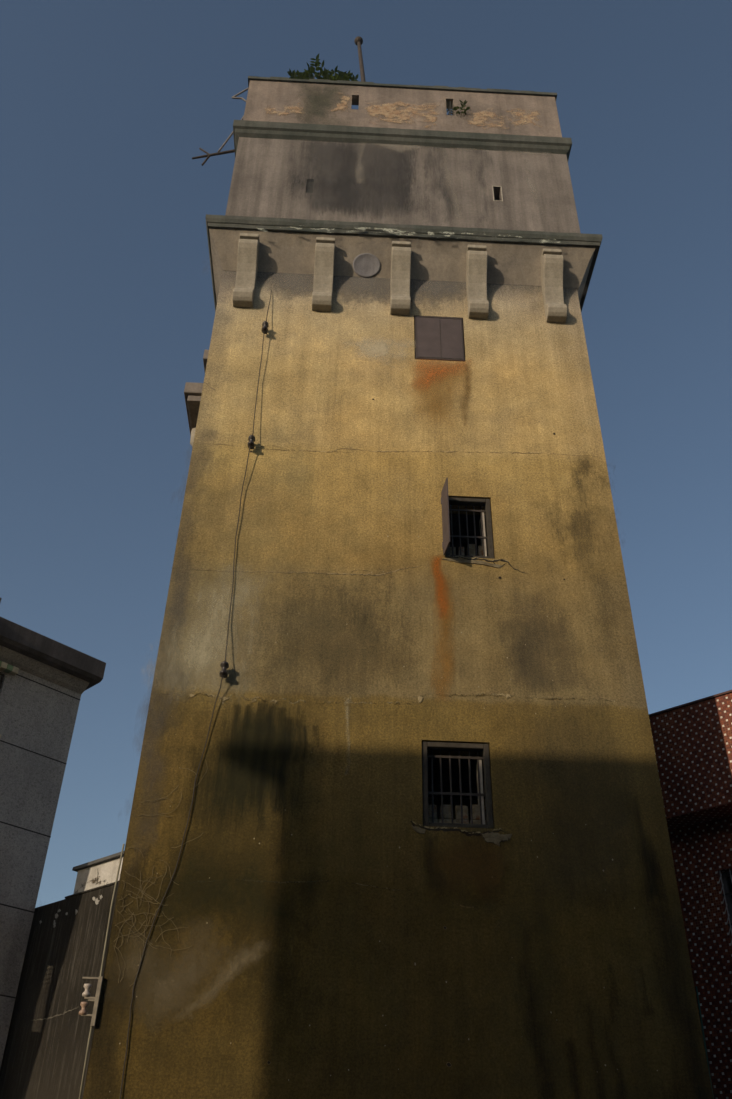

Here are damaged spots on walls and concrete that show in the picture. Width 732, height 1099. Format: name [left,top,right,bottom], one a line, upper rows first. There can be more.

water stain [299,141,411,212]
water stain [203,712,297,814]